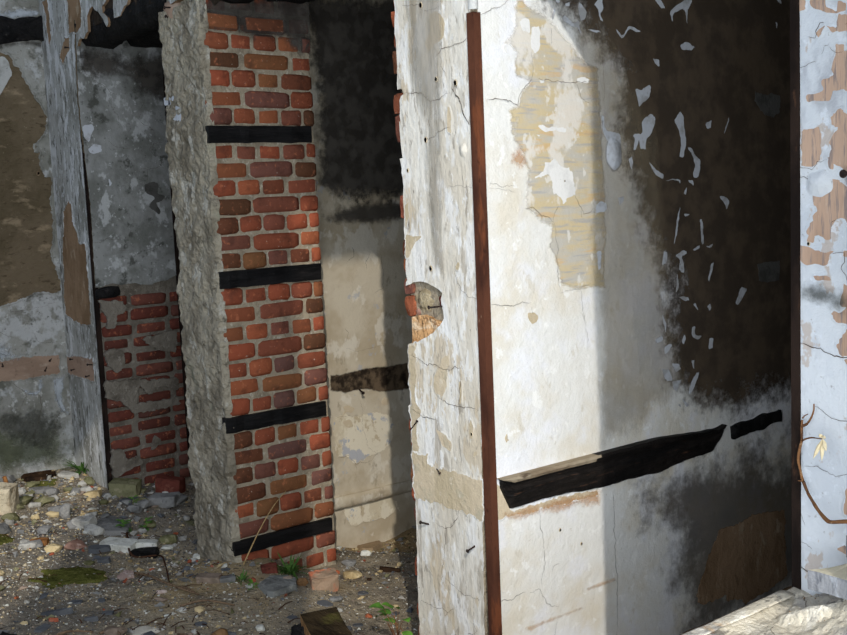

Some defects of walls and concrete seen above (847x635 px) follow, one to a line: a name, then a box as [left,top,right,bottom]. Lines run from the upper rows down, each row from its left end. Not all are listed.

spalling [0,48,189,484]
spalling [393,93,403,143]
crack [404,38,470,139]
peeling [400,195,484,523]
peeling [503,0,621,288]
peeling [629,114,655,169]
peeling [636,85,651,107]
peeling [799,0,847,367]